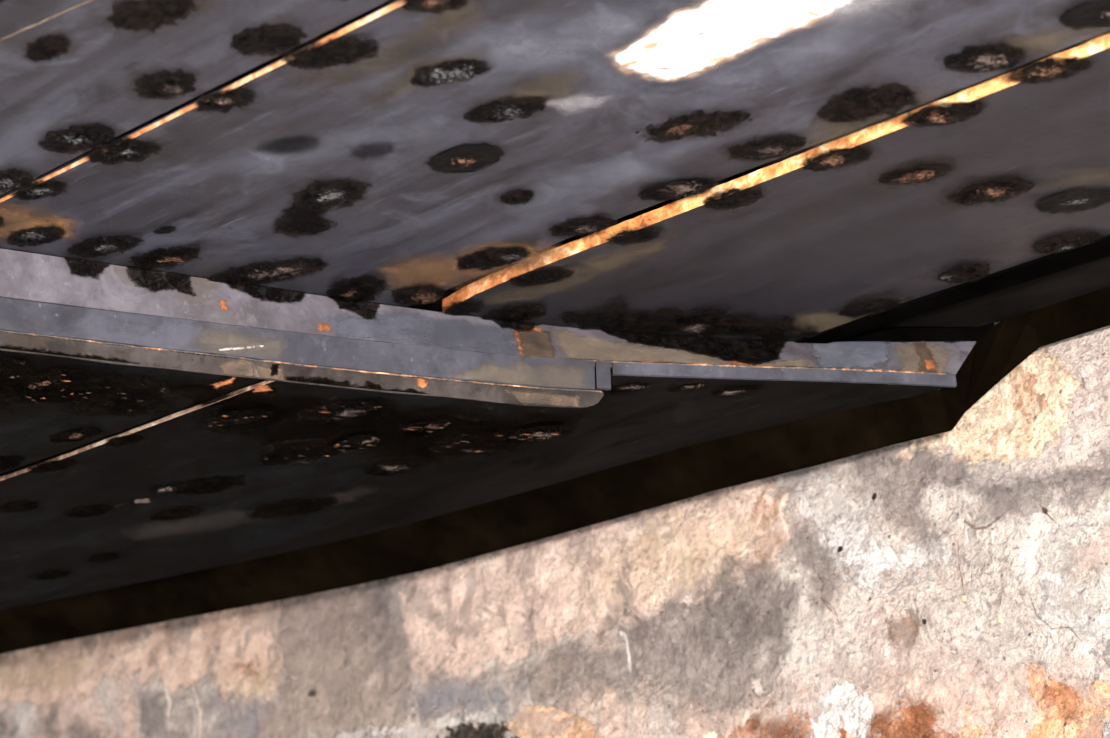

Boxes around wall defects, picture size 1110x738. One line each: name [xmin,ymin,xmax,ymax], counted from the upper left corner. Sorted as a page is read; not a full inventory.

corrosion [1030,65,1065,77]
corrosion [819,154,846,168]
corrosion [897,170,935,183]
corrosion [0,206,73,238]
corrosion [383,246,560,304]
corrosion [488,244,661,302]
corrosion [202,334,284,392]
corrosion [452,328,581,407]
corrosion [914,341,937,373]
corrosion [682,663,1110,738]